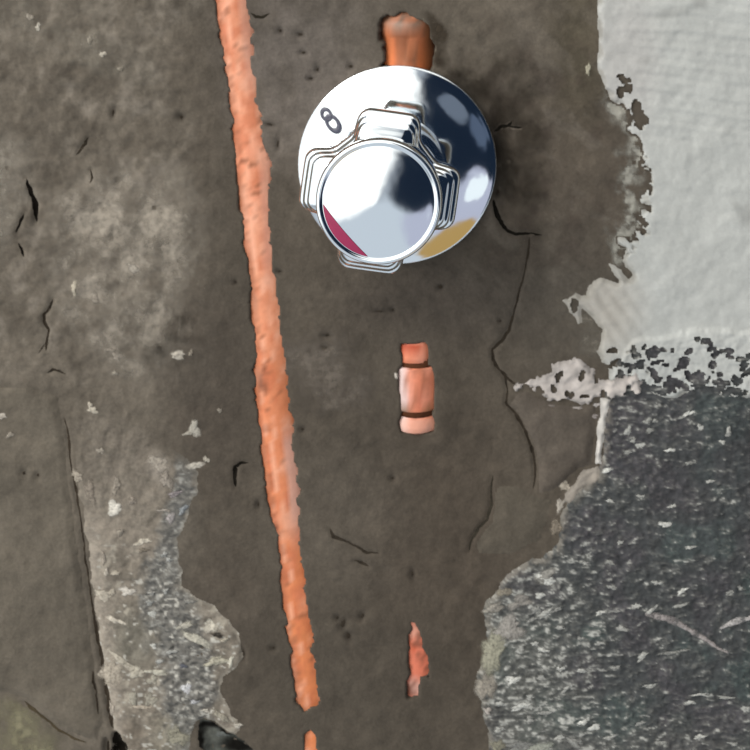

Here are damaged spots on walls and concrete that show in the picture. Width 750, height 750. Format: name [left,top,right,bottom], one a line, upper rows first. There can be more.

crack [494,121,523,132]
crack [16,178,39,257]
crack [39,299,53,352]
crack [491,200,540,487]
crack [233,461,248,487]
crack [64,418,113,728]
peeling [72,391,244,750]
crack [329,529,378,566]
spalling [475,336,750,750]